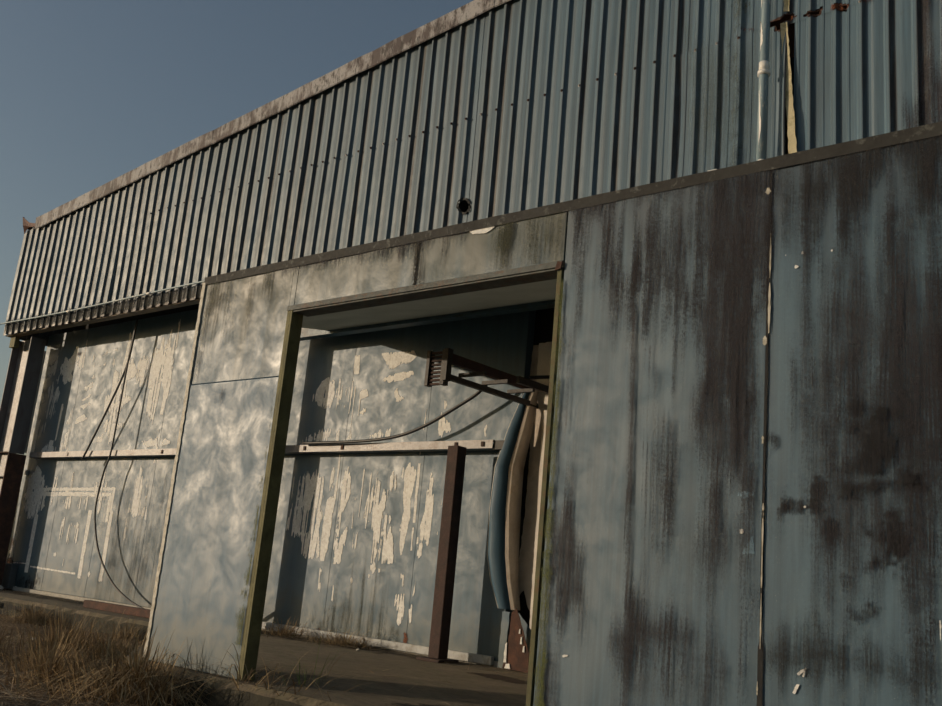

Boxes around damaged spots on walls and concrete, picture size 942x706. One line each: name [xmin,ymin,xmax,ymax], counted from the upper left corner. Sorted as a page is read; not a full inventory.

peeling [30,344,95,452]
peeling [97,319,181,463]
peeling [306,355,368,442]
peeling [382,351,417,402]
peeling [438,401,451,438]
water stain [575,135,942,706]
peeling [7,465,116,582]
peeling [123,466,147,538]
peeling [286,452,442,591]
peeling [394,574,415,626]
water stain [549,468,582,630]